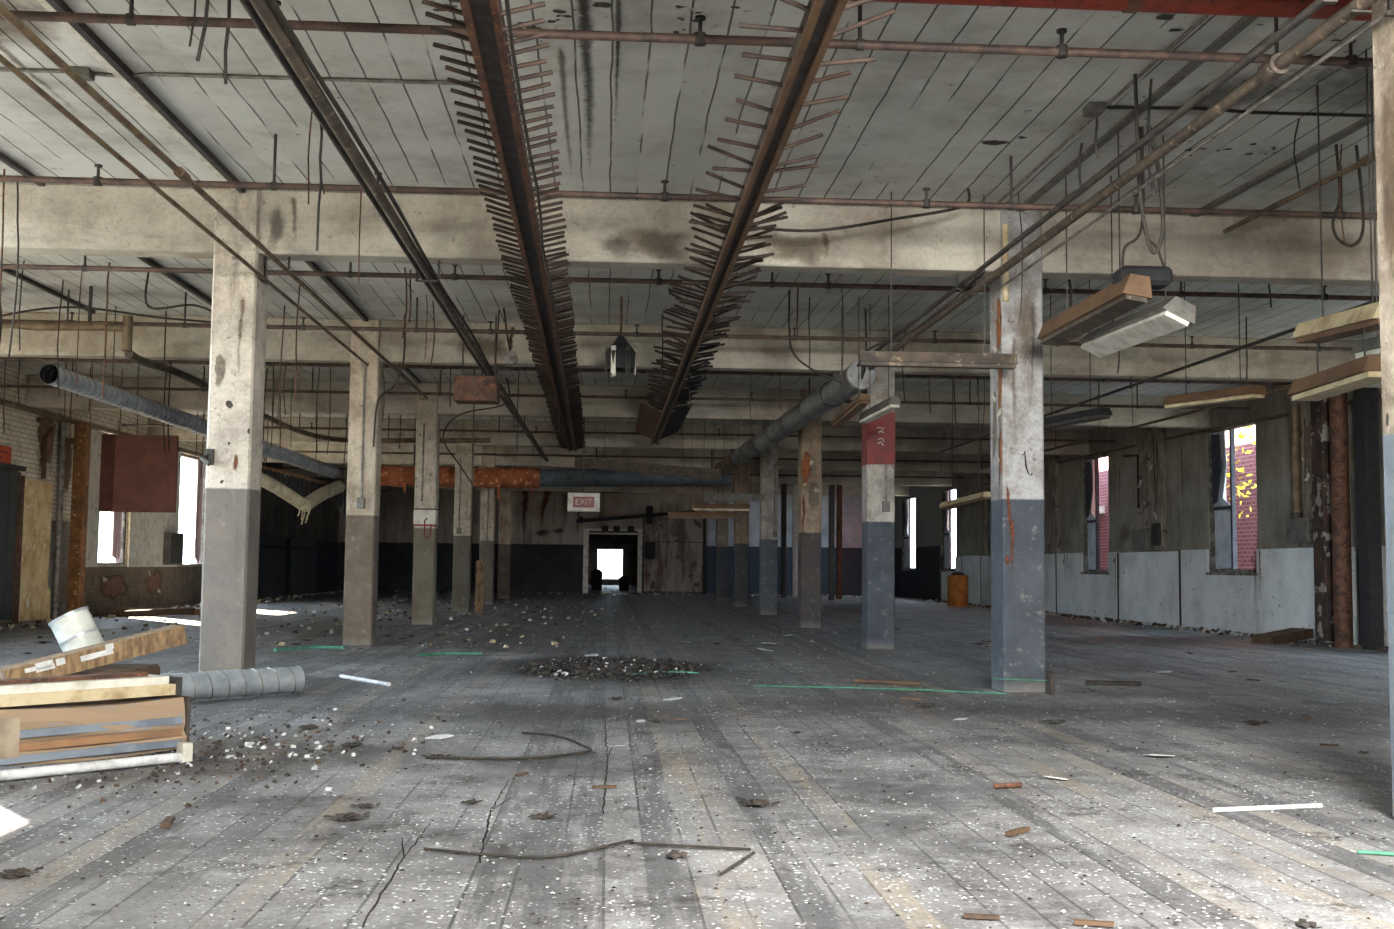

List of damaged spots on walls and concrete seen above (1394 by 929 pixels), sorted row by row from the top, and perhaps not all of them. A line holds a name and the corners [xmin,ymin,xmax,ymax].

water stain [559,51,568,138]
water stain [578,0,592,140]
water stain [632,233,676,253]